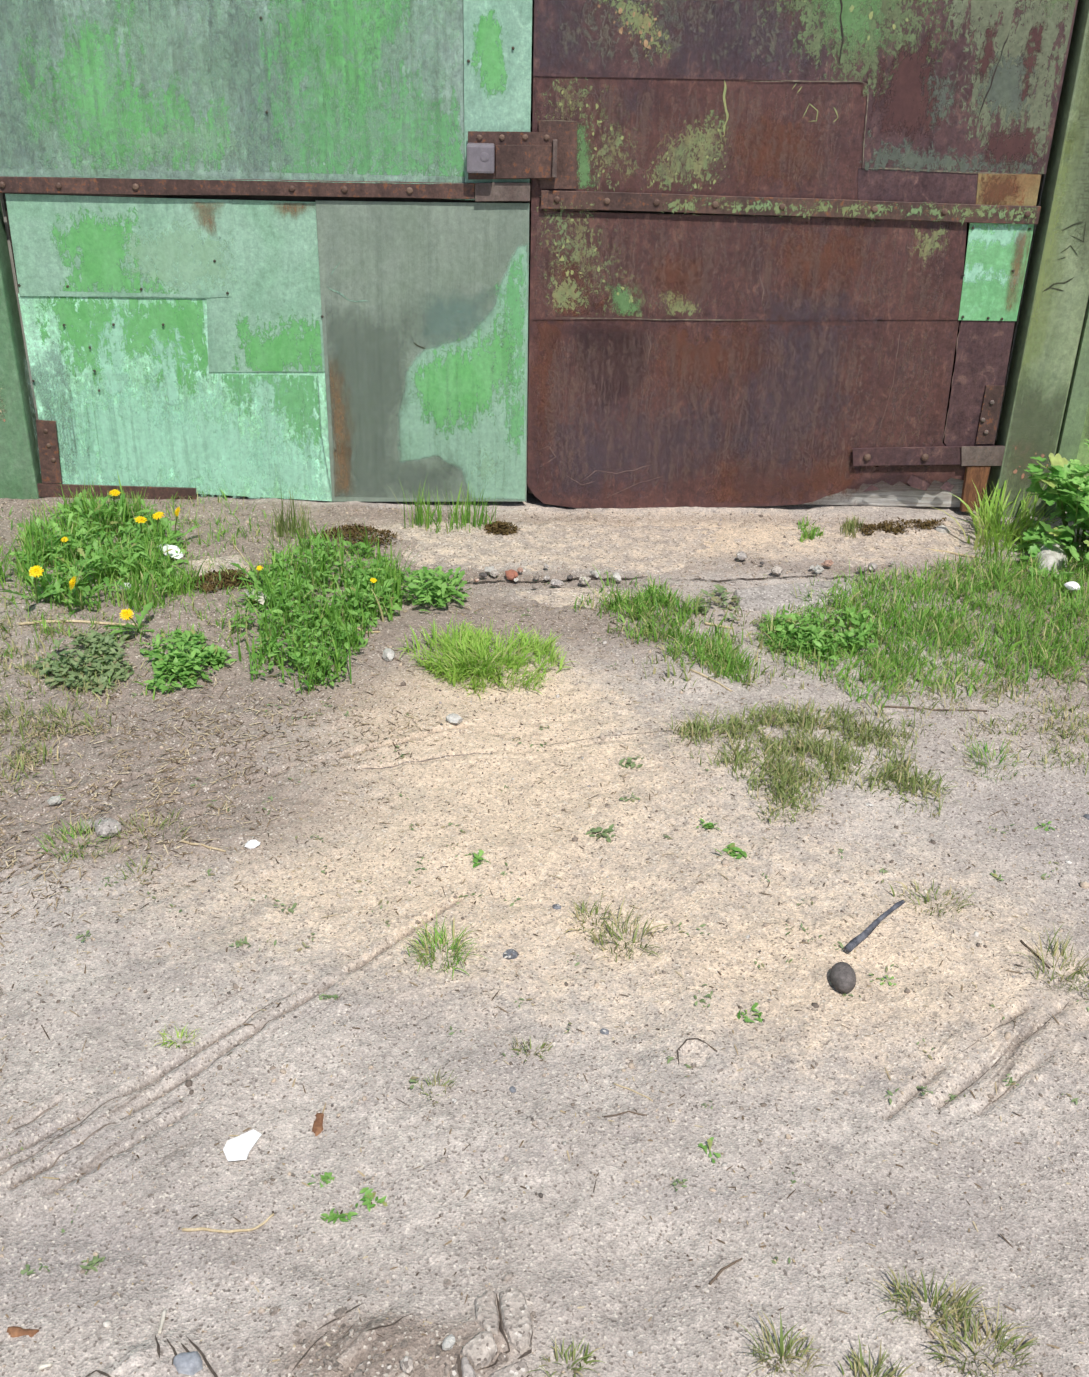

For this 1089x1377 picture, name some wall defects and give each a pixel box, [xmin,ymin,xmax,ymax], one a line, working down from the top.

crack [837,0,845,69]
corrosion [977,22,1046,205]
corrosion [550,255,605,317]
peeling [398,0,1076,500]